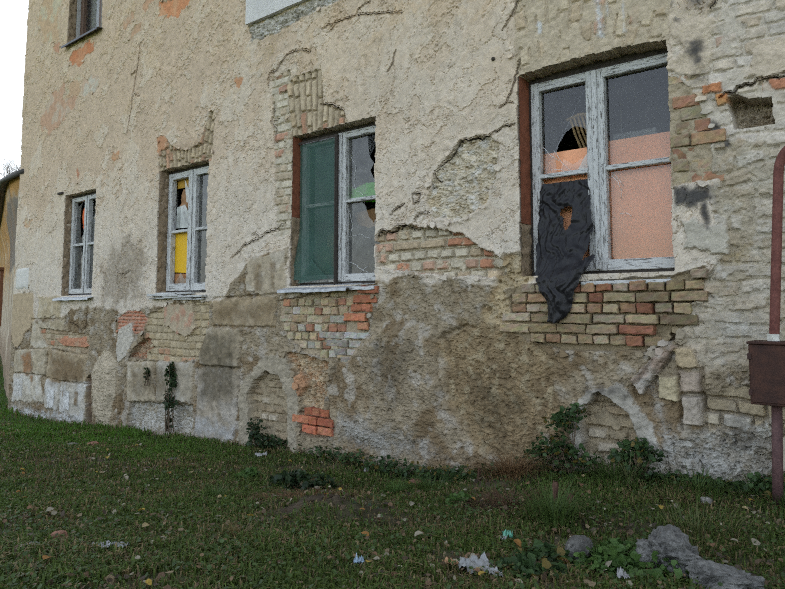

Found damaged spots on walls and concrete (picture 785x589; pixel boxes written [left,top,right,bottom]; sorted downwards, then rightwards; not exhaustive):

flaking render [157,109,215,171]
crack [271,105,279,143]
crack [268,49,311,85]
flaking render [280,70,347,137]
crack [322,102,345,111]
crack [322,1,402,32]
crack [502,0,520,30]
flaking render [507,0,672,76]
flaking render [668,74,775,187]
crack [720,75,785,98]
flaking render [377,136,511,281]
flaking render [280,284,379,441]